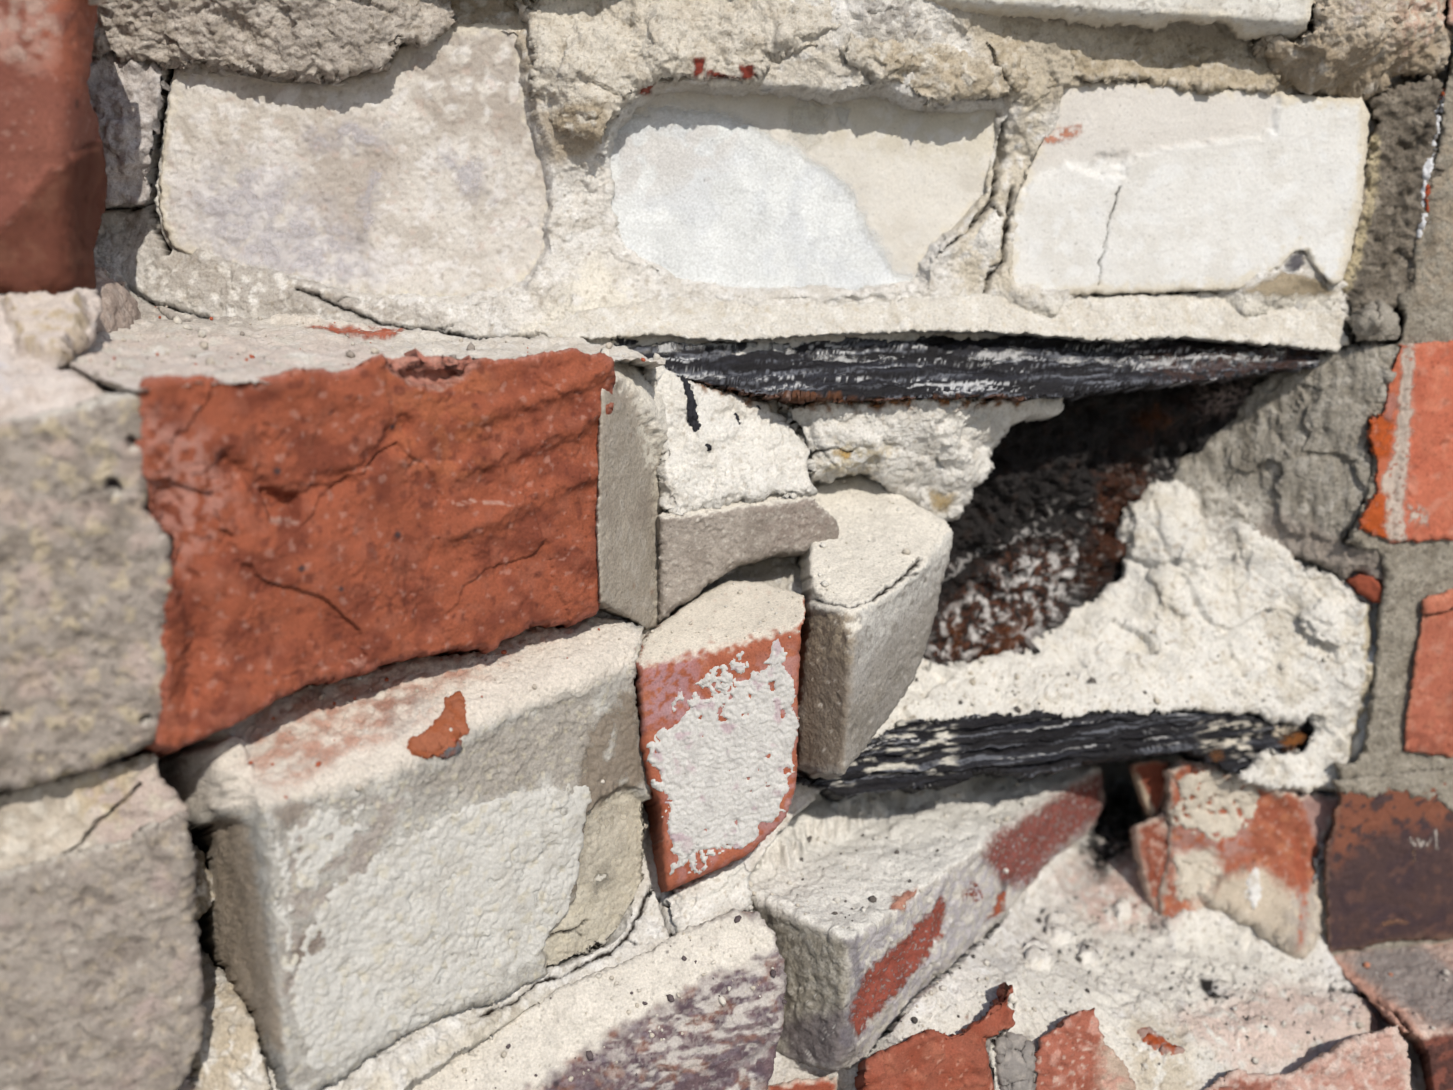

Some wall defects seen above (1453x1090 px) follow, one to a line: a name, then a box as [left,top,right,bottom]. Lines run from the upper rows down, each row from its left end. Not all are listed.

crack [947,124,1012,293]
crack [133,292,209,319]
crack [296,289,488,340]
rust [850,398,912,410]
rust [936,398,1020,407]
spalling [923,379,1256,666]
rust [1085,470,1146,586]
rust [991,617,1031,654]
peeling [646,639,799,875]